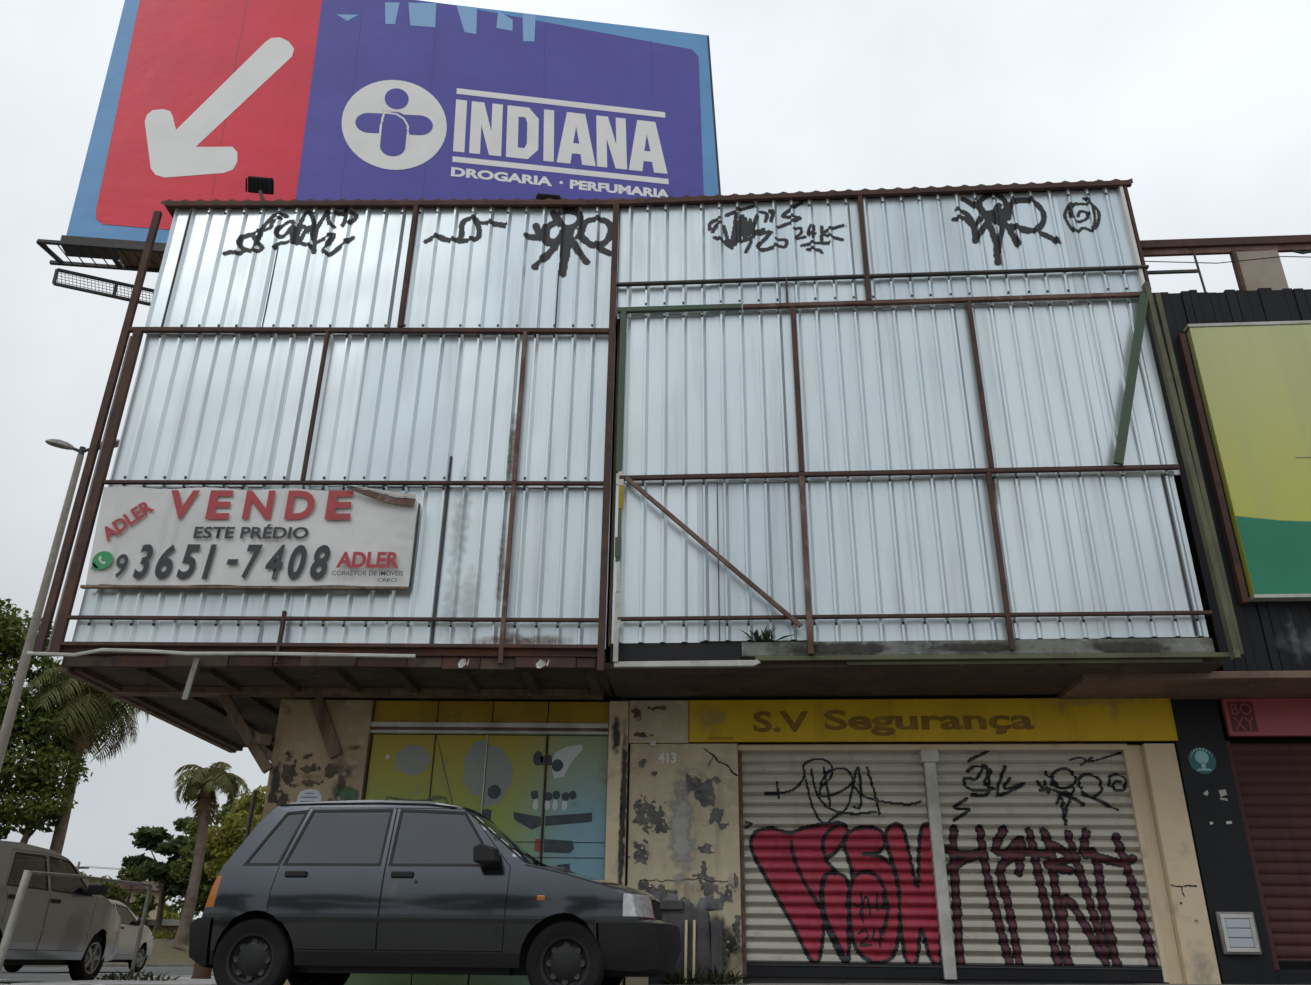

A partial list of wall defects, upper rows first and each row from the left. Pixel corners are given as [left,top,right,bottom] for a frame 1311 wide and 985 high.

peeling [631,705,667,737]
peeling [275,751,347,808]
peeling [680,773,729,830]
peeling [627,794,742,958]